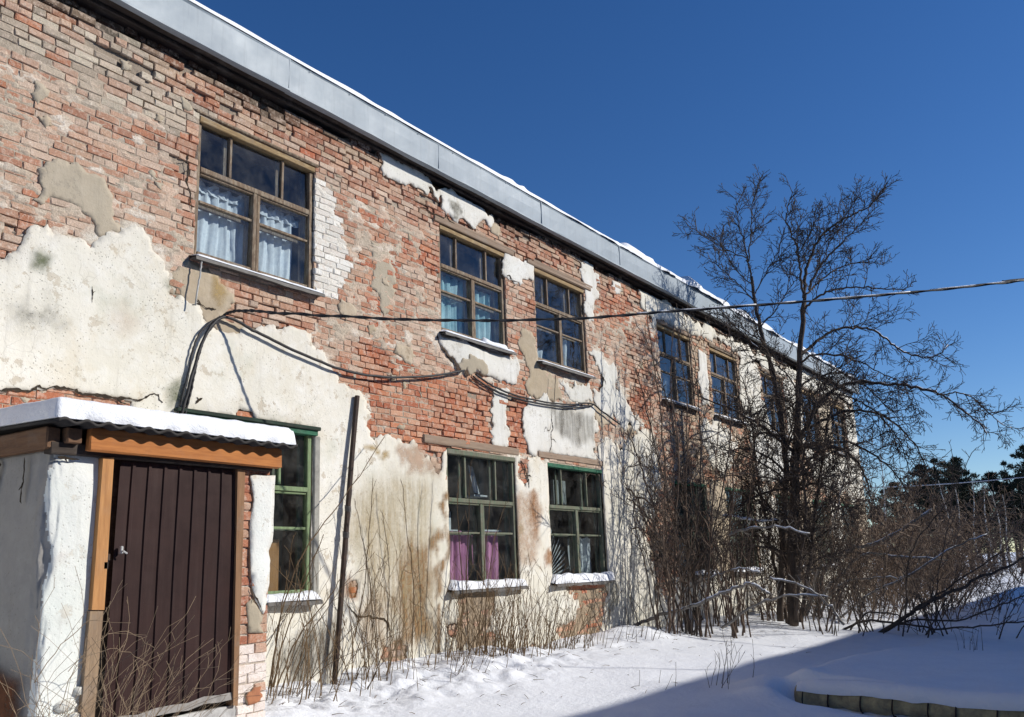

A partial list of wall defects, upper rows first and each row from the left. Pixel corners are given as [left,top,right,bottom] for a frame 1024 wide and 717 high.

spalling [0,0,255,334]
crack [0,385,163,405]
water stain [357,492,450,653]
water stain [370,446,439,472]
spalling [308,152,681,600]
water stain [517,498,541,560]